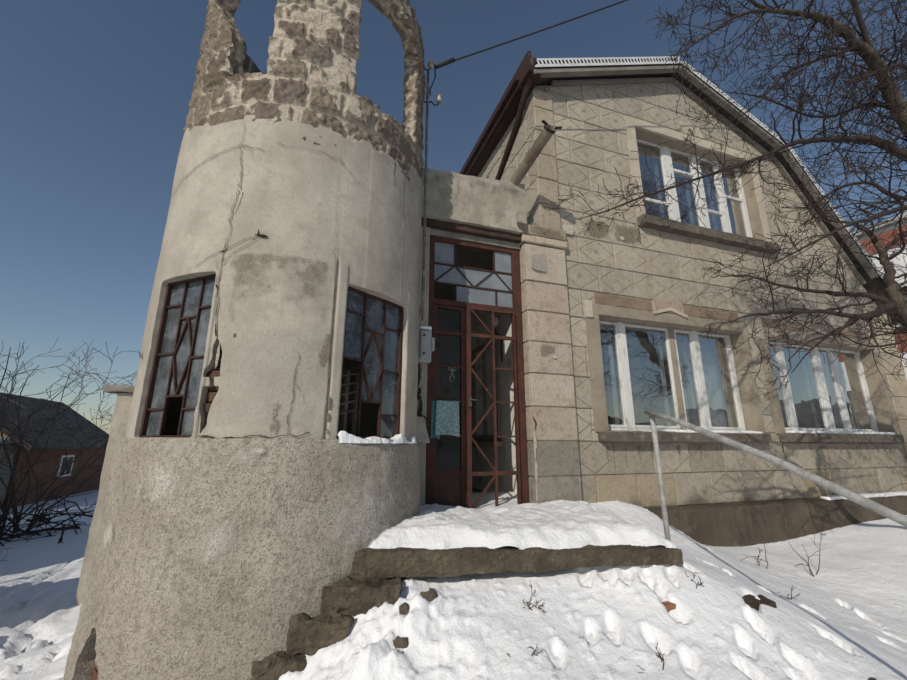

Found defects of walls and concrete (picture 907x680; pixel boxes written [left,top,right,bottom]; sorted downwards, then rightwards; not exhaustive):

crack [174,122,384,438]